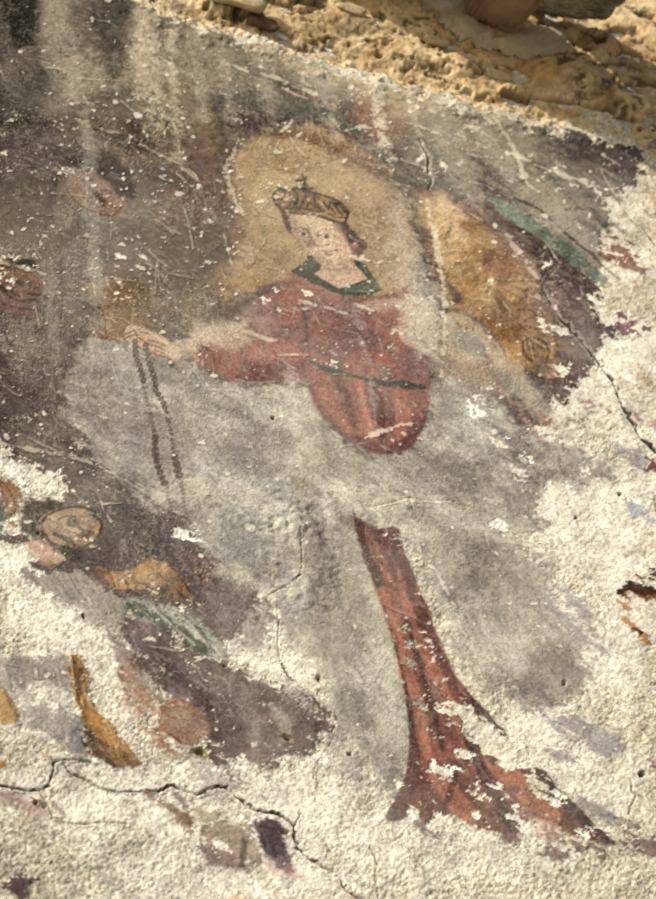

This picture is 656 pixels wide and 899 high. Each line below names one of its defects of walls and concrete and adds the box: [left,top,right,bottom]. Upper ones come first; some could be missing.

crack [539,284,656,460]
peeling [0,394,98,510]
peeling [382,428,454,456]
peeling [507,449,601,538]
peeling [617,450,656,519]
peeling [139,634,158,658]
peeling [182,649,239,702]
flaking render [147,731,211,760]
peeling [637,757,656,778]
crack [0,755,382,899]
peeling [189,826,234,873]
peeling [0,873,40,899]